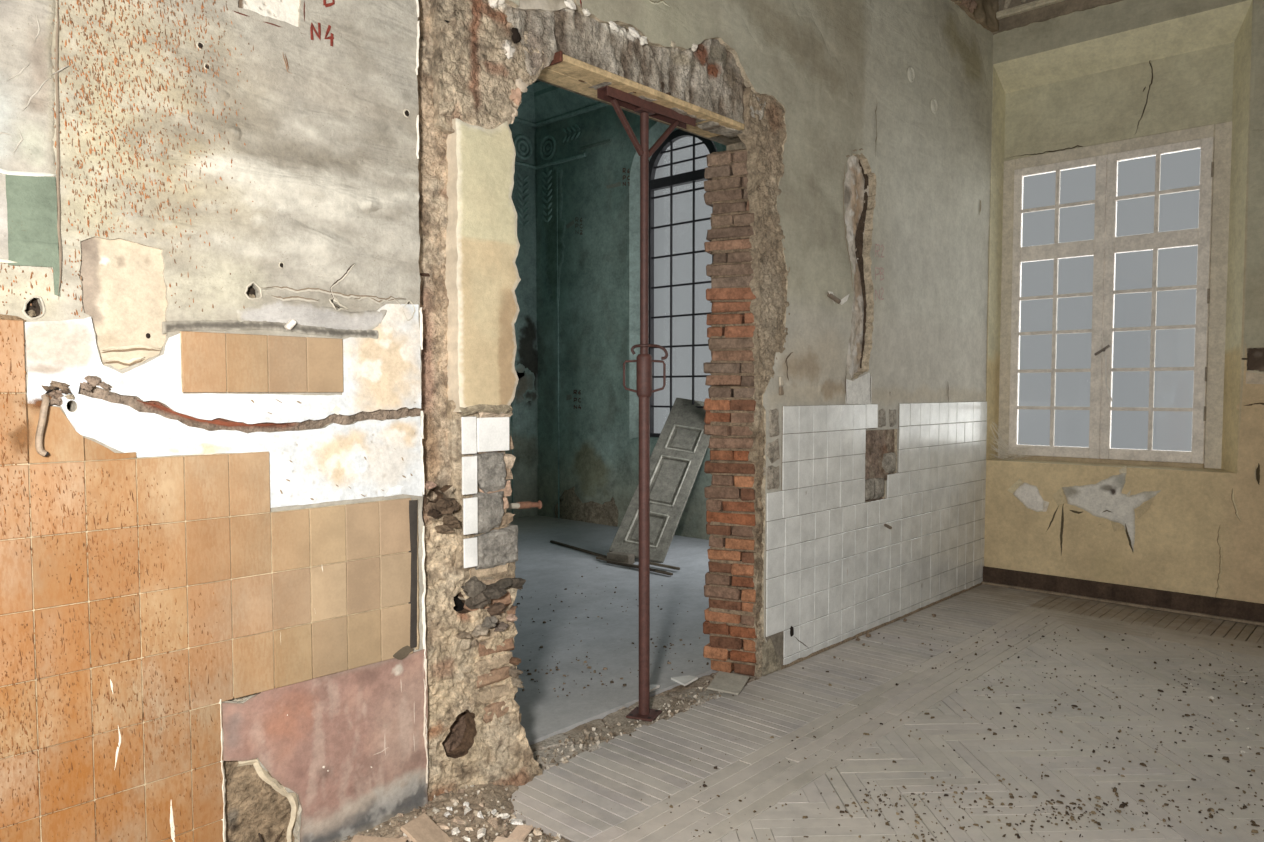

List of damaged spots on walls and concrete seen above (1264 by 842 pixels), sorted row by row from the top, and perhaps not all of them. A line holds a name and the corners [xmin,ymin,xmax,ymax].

flaking render [608,21,648,46]
crack [1135,61,1153,134]
peeling [1242,347,1264,384]
flaking render [22,0,591,842]
spalling [865,408,896,501]
peeling [1008,466,1161,553]